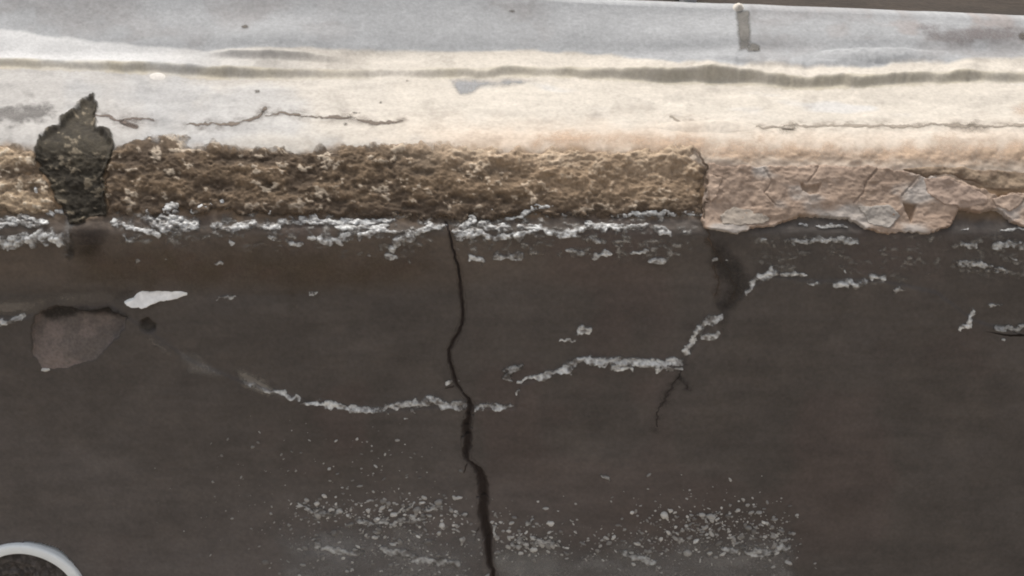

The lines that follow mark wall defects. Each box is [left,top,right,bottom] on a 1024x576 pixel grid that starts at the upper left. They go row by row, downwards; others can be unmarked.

spalling [0,92,1024,235]
leakage [0,199,702,265]
leakage [712,222,859,302]
leakage [957,227,1024,275]
spalling [32,291,187,372]
crack [441,216,498,576]
leakage [239,314,723,427]
crack [656,366,688,427]
leakage [225,437,802,576]